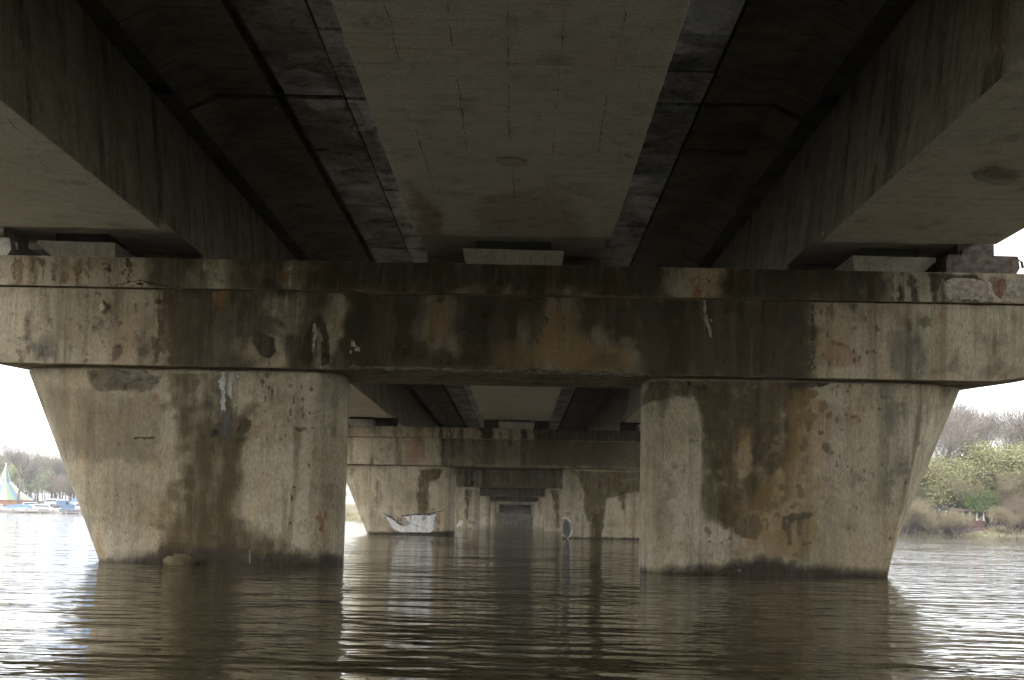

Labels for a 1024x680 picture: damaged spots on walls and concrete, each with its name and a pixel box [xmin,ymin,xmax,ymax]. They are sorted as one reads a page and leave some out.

leakage [100,258,921,578]